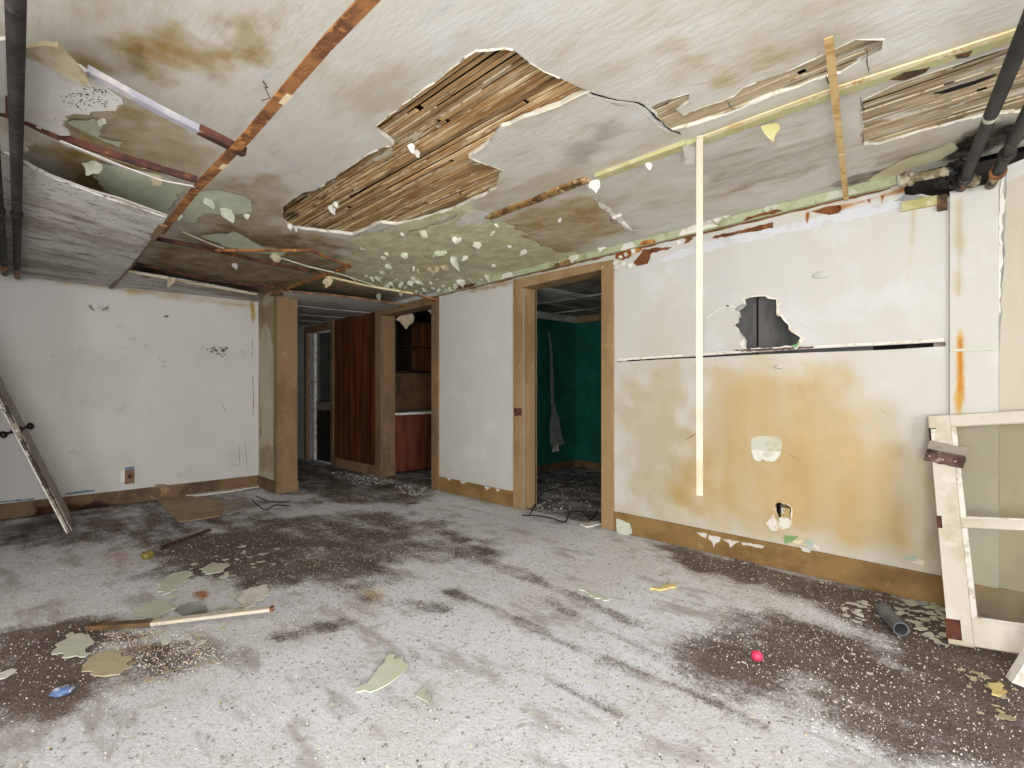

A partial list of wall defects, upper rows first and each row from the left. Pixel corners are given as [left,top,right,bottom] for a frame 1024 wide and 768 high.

peeling [66,118,124,147]
crack [586,92,681,135]
spalling [652,38,885,128]
spalling [858,48,1009,145]
spalling [1000,59,1024,114]
spalling [281,47,590,300]
peeling [82,160,286,263]
hole [626,295,906,361]
peeling [751,436,800,462]
peeling [697,532,764,548]
spalling [766,502,819,553]